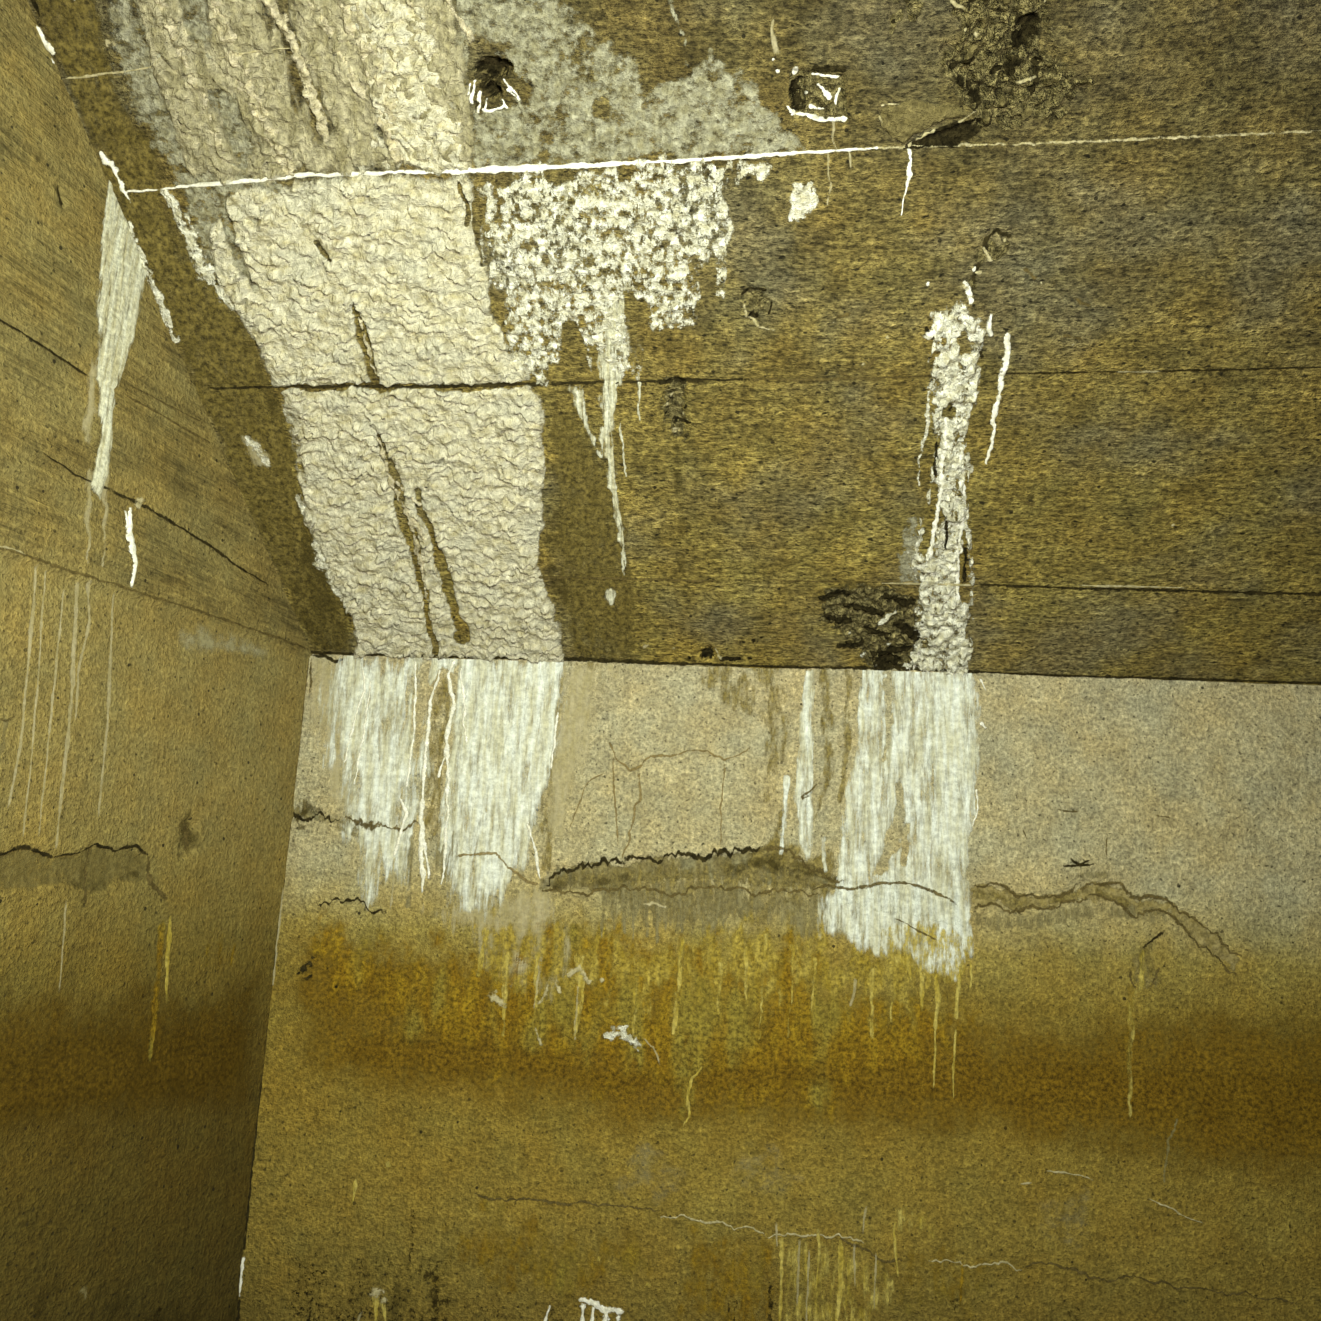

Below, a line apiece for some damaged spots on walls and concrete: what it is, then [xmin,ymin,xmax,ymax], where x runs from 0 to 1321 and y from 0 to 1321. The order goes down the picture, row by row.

spalling [879,0,1096,149]
leakage [788,182,818,222]
crack [43,452,268,585]
leakage [35,0,801,990]
leakage [9,570,91,845]
leakage [302,267,1321,1159]
spalling [818,583,931,671]
crack [563,656,1321,685]
crack [0,546,538,1321]
rust [313,906,974,1126]
crack [813,834,1241,975]
rust [1127,930,1164,1050]